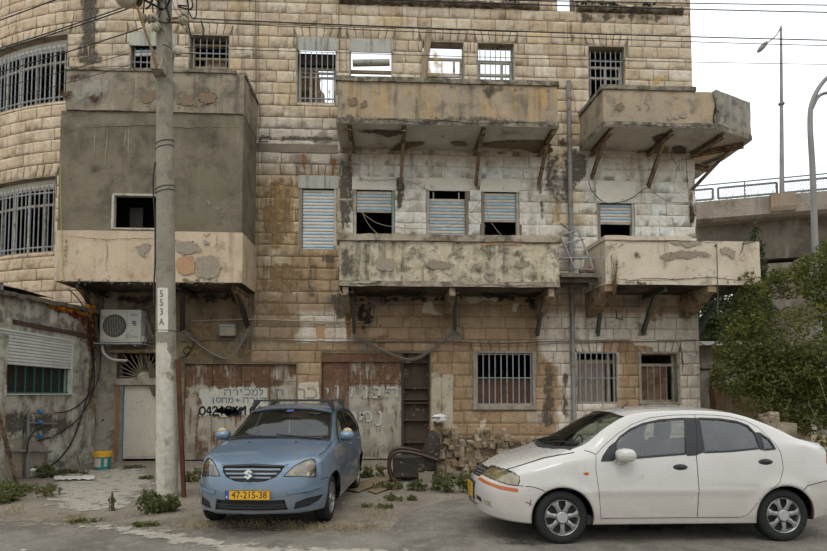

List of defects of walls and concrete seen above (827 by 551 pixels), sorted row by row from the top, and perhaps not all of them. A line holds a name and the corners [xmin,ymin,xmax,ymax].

leakage [70,0,116,103]
crack [609,92,719,130]
leakage [263,178,294,248]
leakage [482,140,587,223]